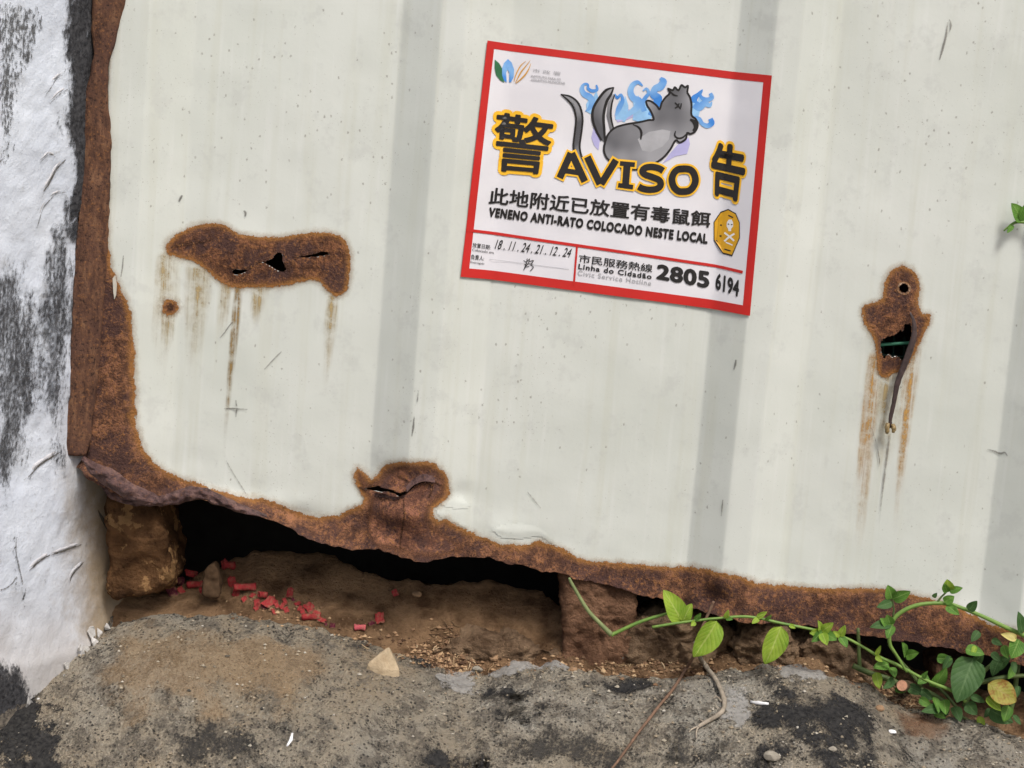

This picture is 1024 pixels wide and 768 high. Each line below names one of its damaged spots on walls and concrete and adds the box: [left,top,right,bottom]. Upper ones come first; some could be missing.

crack [359,476,442,548]
corrosion [76,223,1024,666]